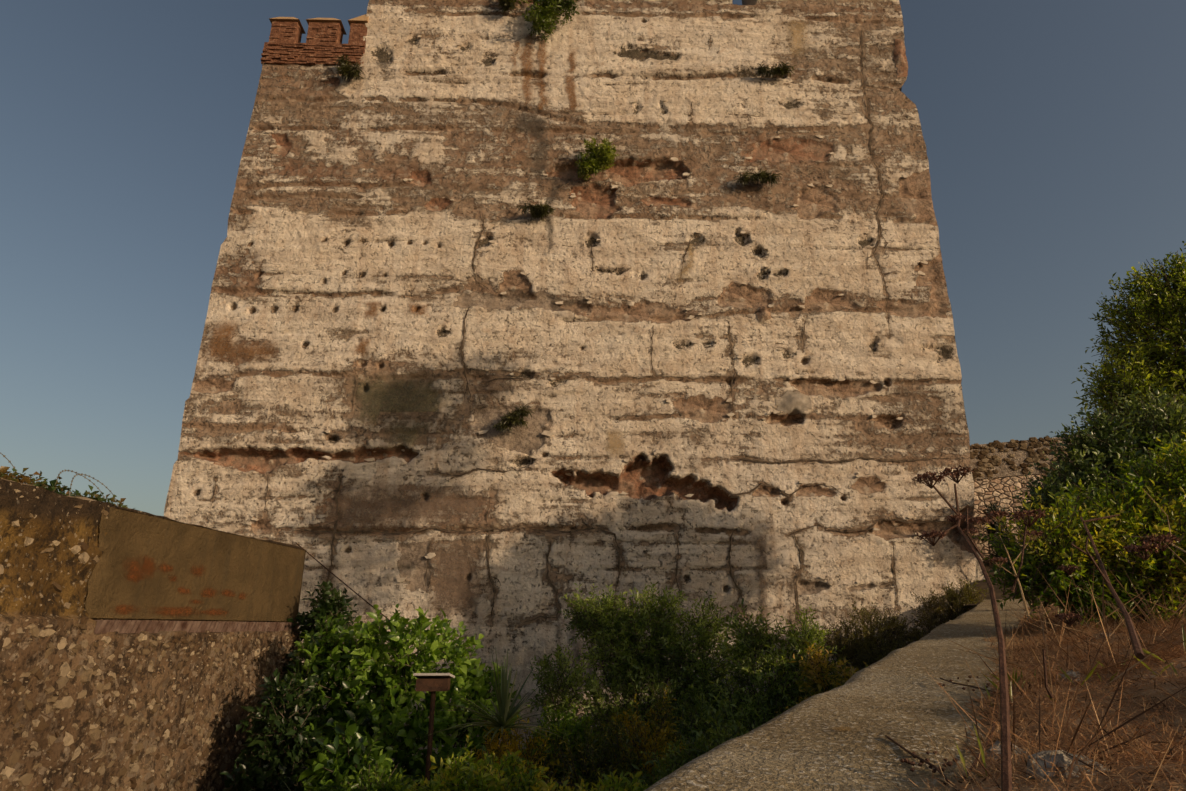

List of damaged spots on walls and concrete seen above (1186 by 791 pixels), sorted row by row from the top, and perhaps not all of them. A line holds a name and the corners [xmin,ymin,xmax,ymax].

spalling [543,157,691,248]
crack [848,30,892,332]
crack [459,214,536,405]
spalling [551,449,738,512]
peeling [752,481,836,497]
peeling [851,472,886,495]
crack [671,535,682,602]
crack [728,533,743,608]
crack [733,457,959,624]
spalling [869,505,977,553]